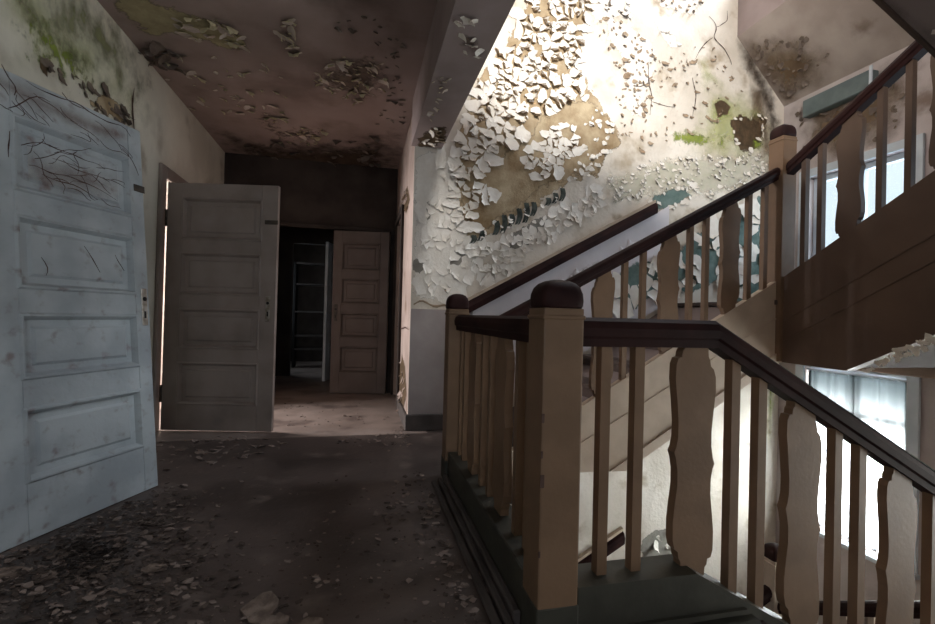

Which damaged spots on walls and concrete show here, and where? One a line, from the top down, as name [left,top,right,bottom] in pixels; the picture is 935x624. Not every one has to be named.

water stain [56,1,117,59]
peeling [40,57,135,126]
peeling [114,0,381,167]
peeling [313,16,406,125]
peeling [401,0,769,308]
water stain [745,36,829,171]
peeling [612,255,658,318]
flaking render [861,333,935,373]